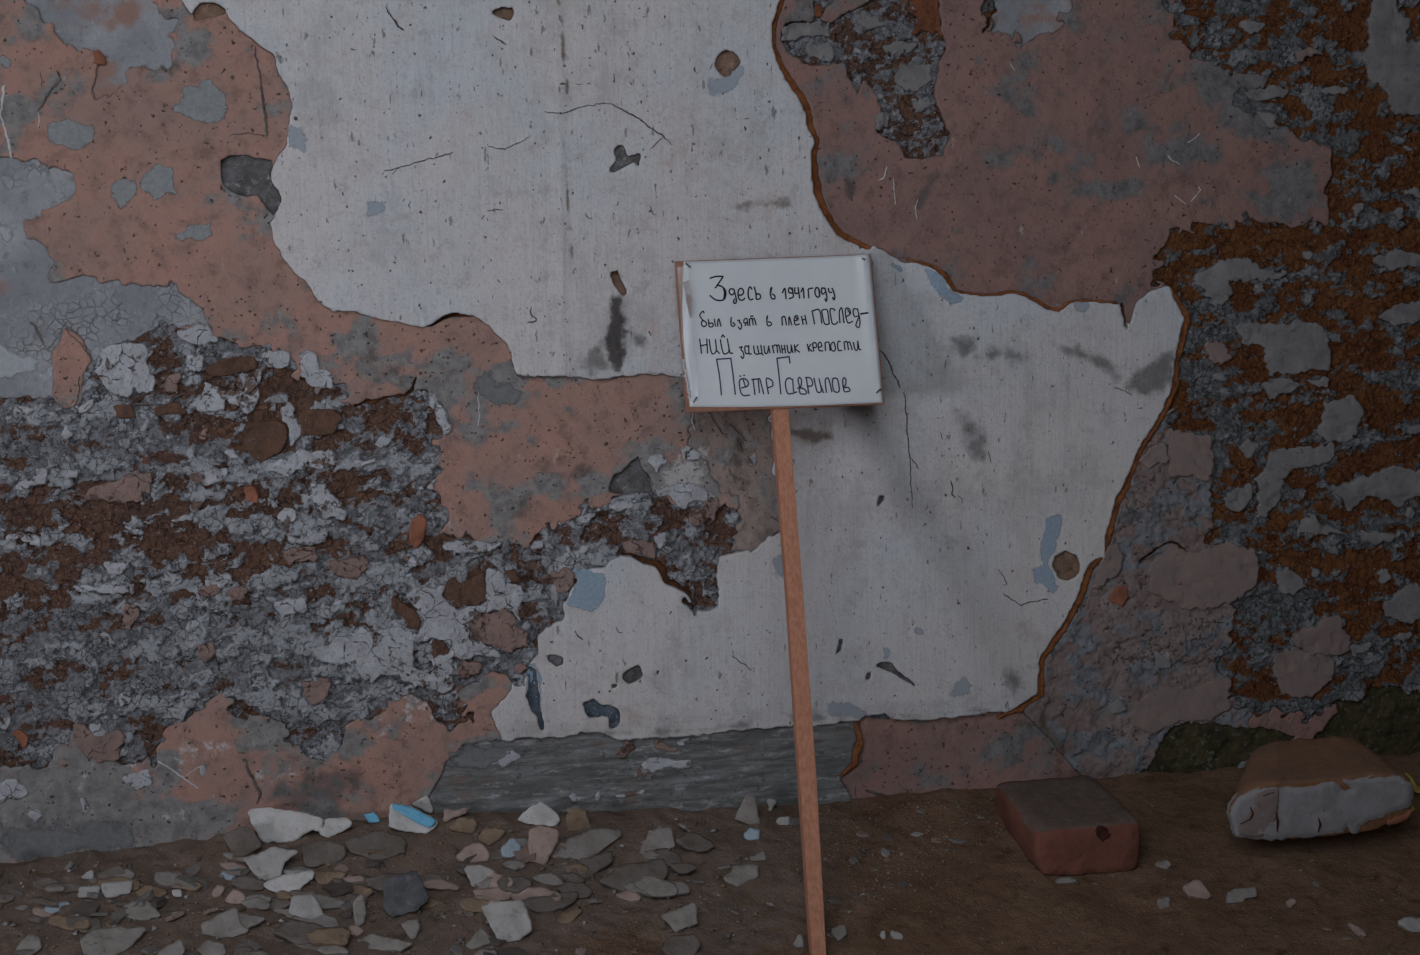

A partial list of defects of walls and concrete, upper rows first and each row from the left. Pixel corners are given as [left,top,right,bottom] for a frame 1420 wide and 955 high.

crack [488,103,672,150]
crack [385,152,453,173]
spalling [776,0,1420,805]
spalling [0,0,799,955]
flaking render [793,934,804,948]